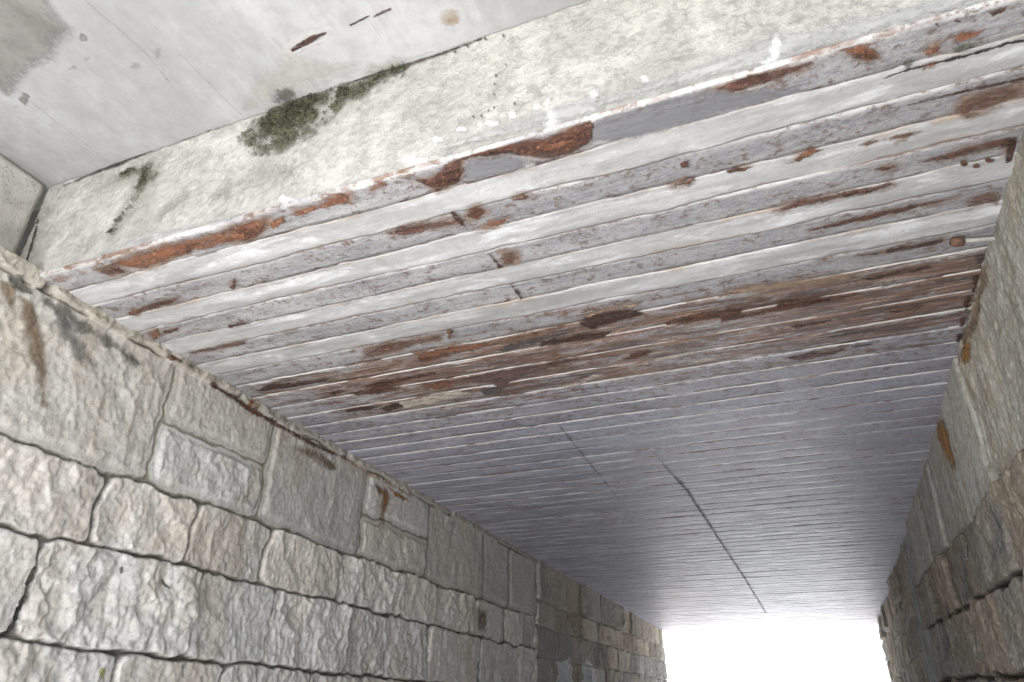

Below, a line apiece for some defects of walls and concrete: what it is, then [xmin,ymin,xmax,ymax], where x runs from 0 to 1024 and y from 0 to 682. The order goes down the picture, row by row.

rust [840,45,878,61]
rust [903,20,984,70]
rust [711,63,811,94]
peeling [591,89,799,140]
rust [954,81,1024,120]
rust [923,138,1017,168]
crack [451,212,464,226]
crack [483,249,523,300]
rust [129,297,178,316]
rust [787,330,875,361]
rust [210,274,860,522]
crack [653,452,765,612]